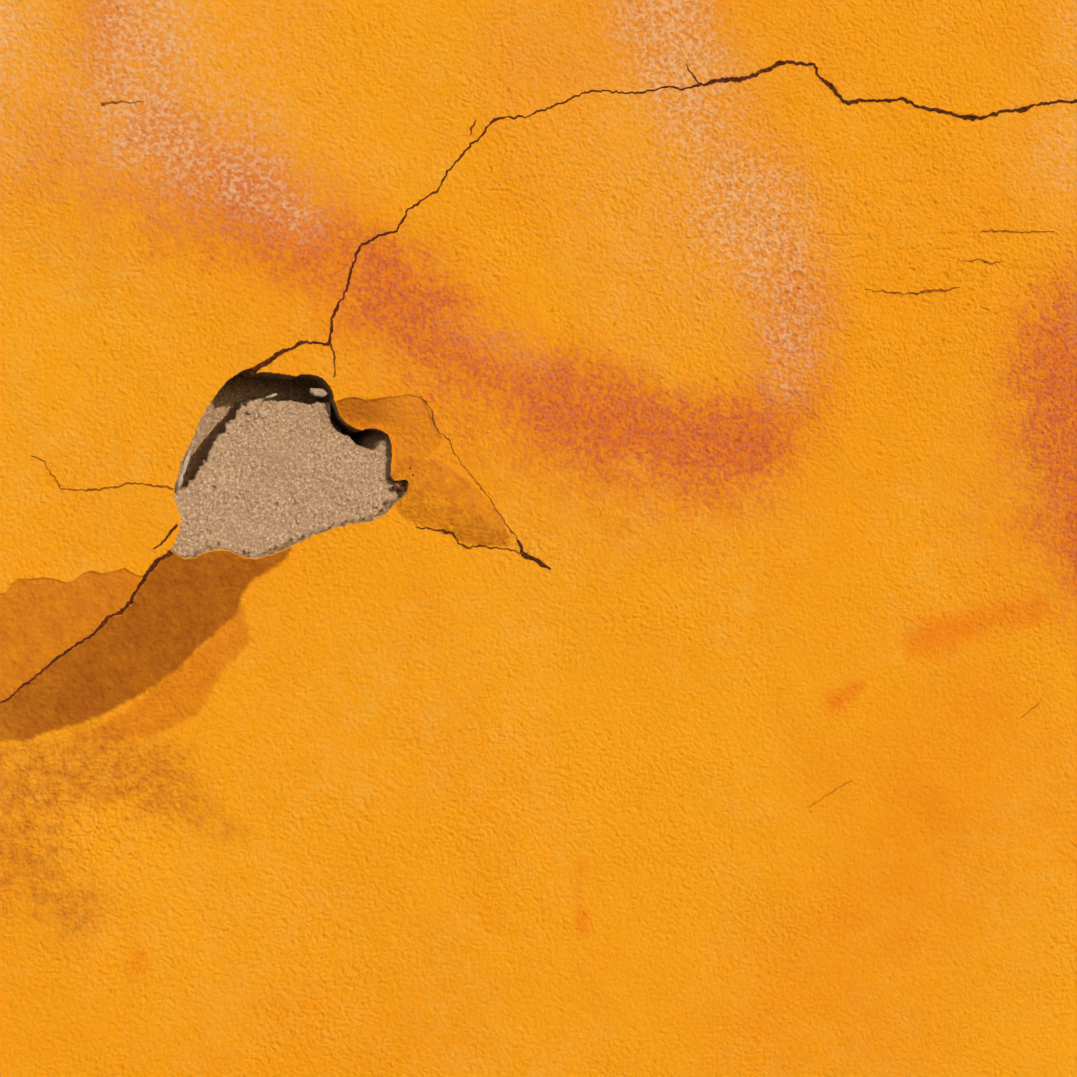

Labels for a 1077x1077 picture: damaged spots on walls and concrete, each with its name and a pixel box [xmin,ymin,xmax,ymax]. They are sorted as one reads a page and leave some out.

crack [101,99,144,107]
crack [249,60,1077,377]
crack [31,455,174,492]
flaking render [170,368,414,559]
crack [415,396,551,570]
crack [0,524,178,703]